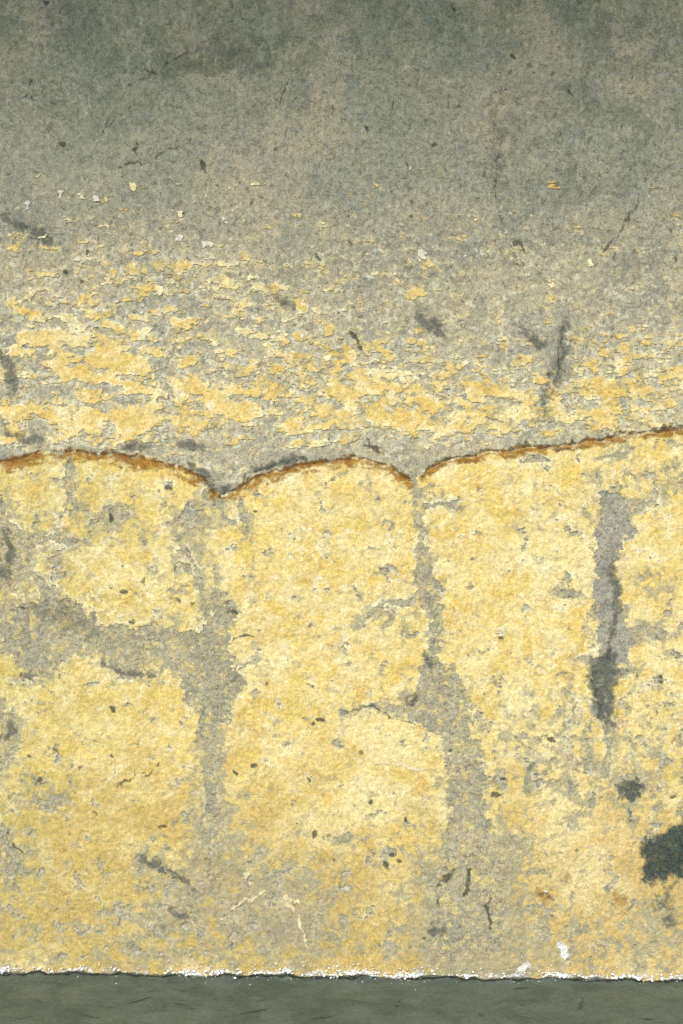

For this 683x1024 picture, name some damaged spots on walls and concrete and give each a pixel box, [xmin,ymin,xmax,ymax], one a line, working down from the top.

peeling [0,210,683,456]
crack [222,456,305,494]
crack [363,438,380,453]
crack [422,424,683,477]
damp [586,564,623,727]
mould [640,819,683,928]